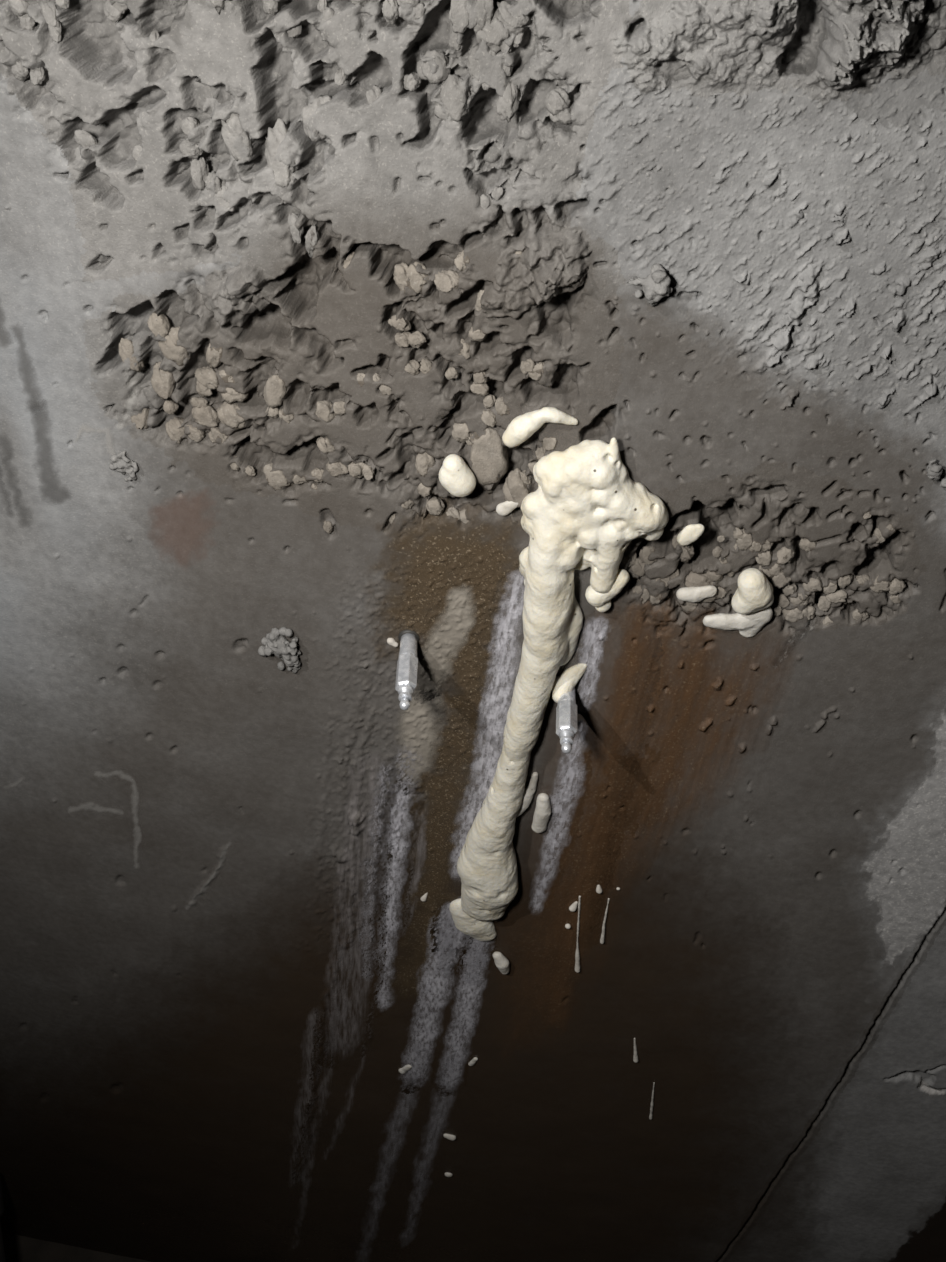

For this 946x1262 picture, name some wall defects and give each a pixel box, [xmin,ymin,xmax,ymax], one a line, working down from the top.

damp [0,575,749,1262]
rust [383,512,520,996]
crack [713,900,946,1262]
damp [864,714,946,964]
spalling [879,1057,946,1101]
damp [890,1202,946,1262]